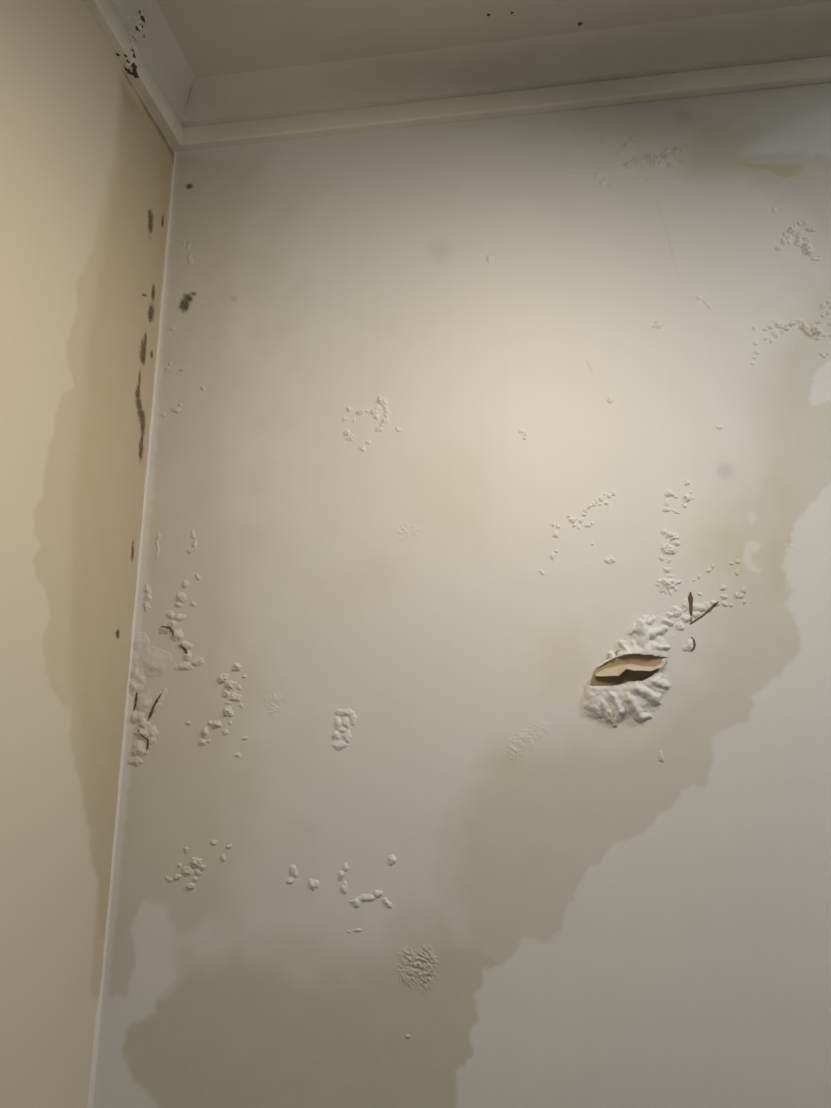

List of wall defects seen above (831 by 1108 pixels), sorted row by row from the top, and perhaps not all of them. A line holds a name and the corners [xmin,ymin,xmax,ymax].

damp [30,11,173,1005]
peeling [127,611,204,767]
damp [105,140,520,1108]
damp [395,82,831,980]